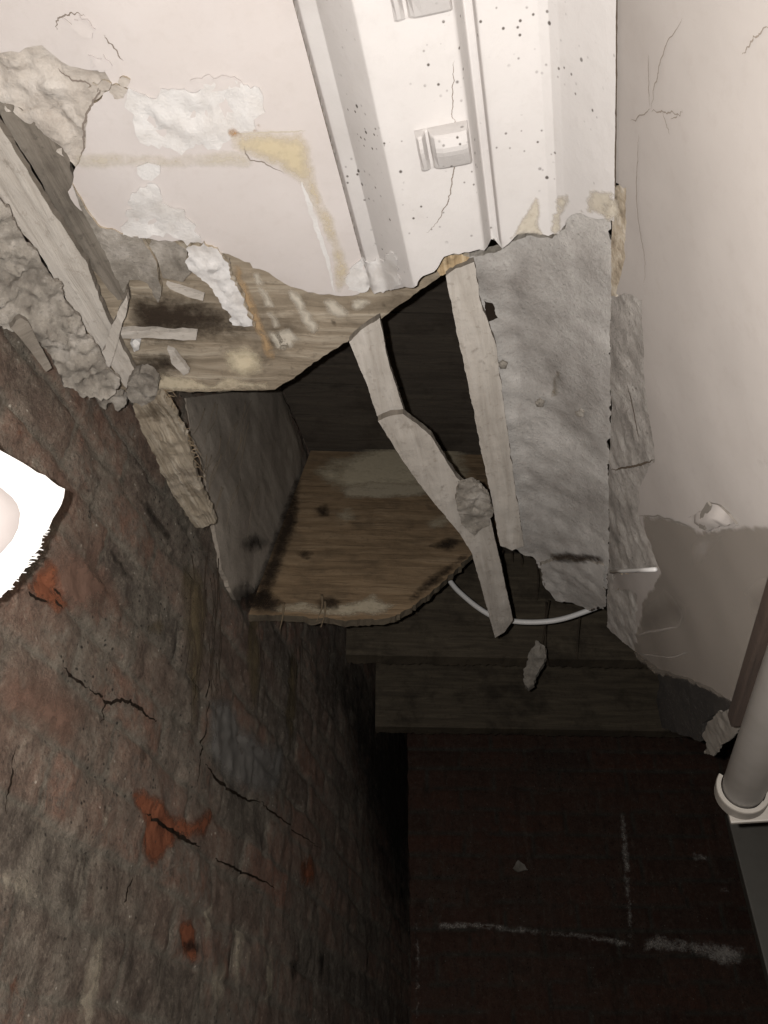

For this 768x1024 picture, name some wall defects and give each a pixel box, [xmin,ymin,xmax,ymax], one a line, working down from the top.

crack [742,26,768,54]
spalling [0,45,265,167]
crack [614,0,683,260]
peeling [120,162,201,246]
damp [228,130,345,292]
crack [426,167,455,233]
peeling [344,251,402,294]
peeling [686,501,738,531]
crack [65,668,157,723]
crack [193,656,321,849]
crack [147,814,274,888]